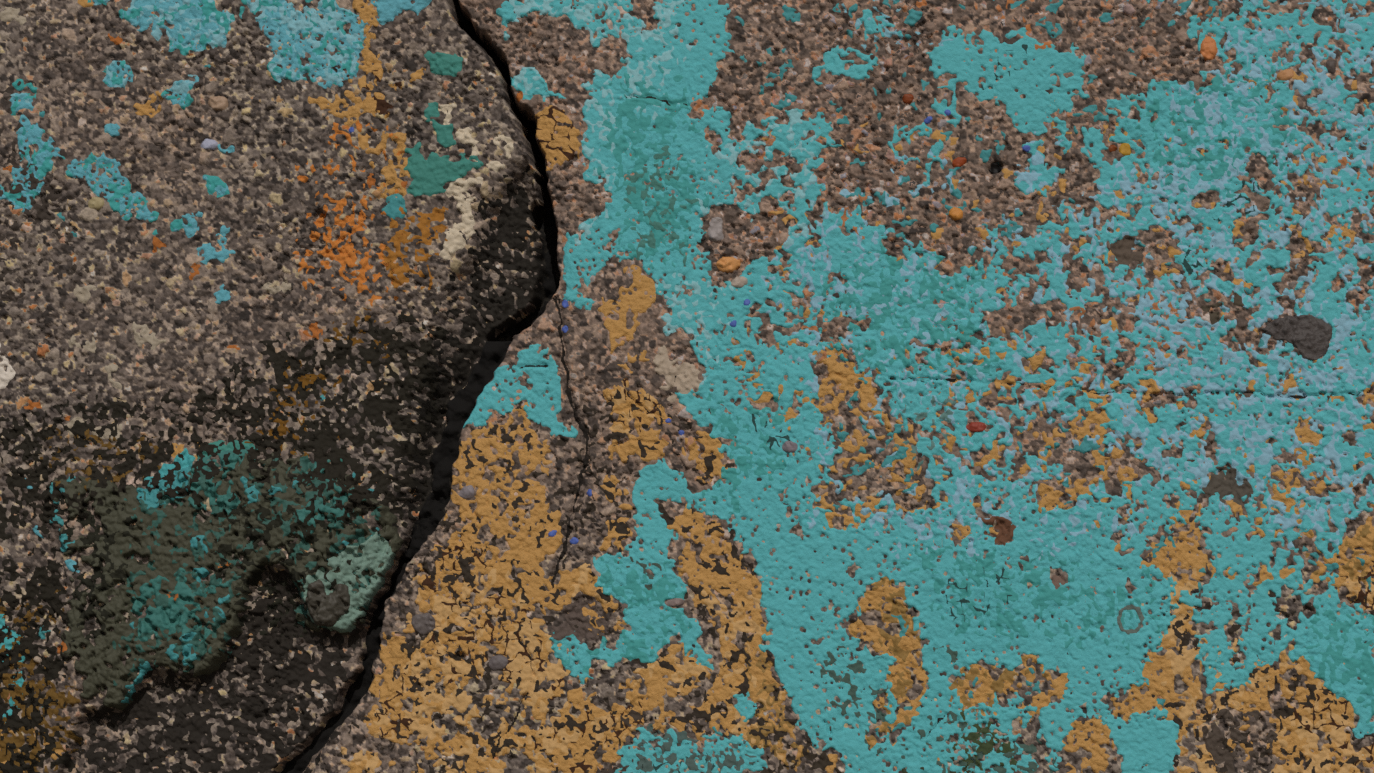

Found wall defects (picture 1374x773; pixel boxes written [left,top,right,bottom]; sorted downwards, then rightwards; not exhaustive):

spalling [0,7,27,25]
spalling [439,103,514,260]
spalling [1110,235,1144,266]
spalling [73,285,97,303]
spalling [1201,292,1245,325]
crack [281,0,715,773]
spalling [653,345,702,402]
spalling [1202,466,1254,506]
spalling [981,516,1016,546]
spalling [551,592,610,644]
spalling [1202,708,1278,773]
spalling [760,752,842,773]